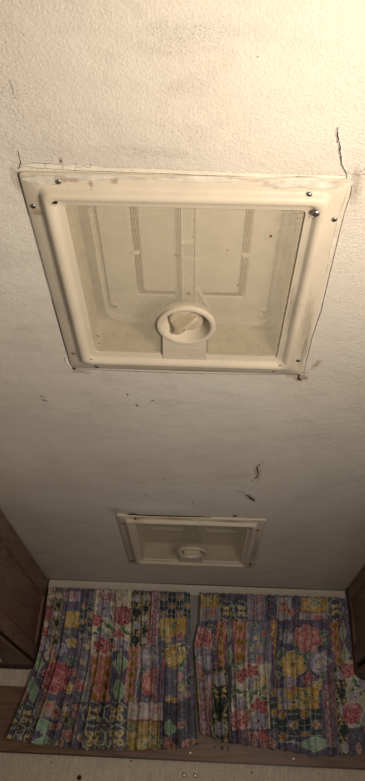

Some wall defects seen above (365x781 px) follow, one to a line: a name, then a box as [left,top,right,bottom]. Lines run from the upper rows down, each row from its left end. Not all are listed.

crack [335,127,365,185]